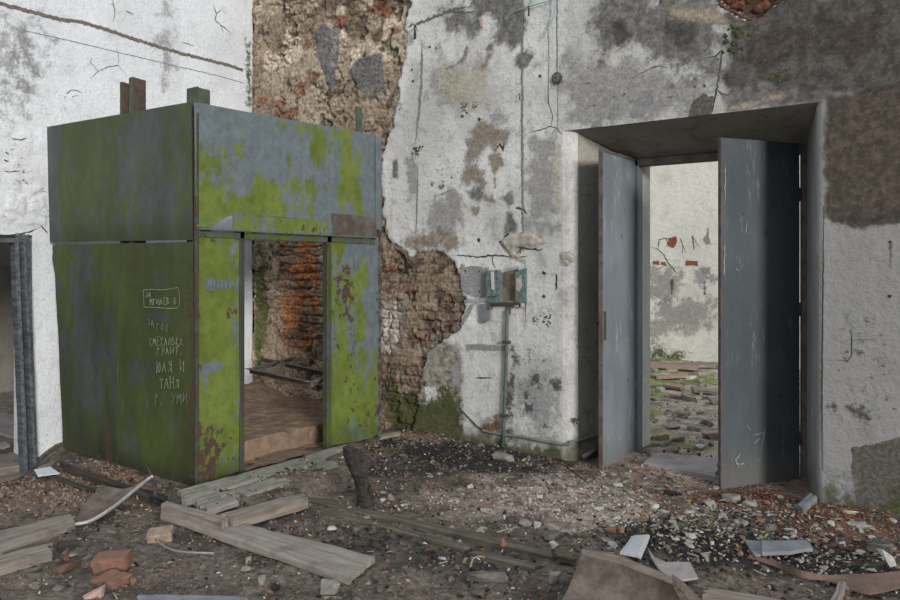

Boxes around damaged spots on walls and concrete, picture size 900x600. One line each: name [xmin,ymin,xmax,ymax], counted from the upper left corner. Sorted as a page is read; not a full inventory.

crack [22,30,243,98]
spalling [251,0,412,161]
water stain [405,0,533,251]
crack [707,50,730,108]
spalling [667,0,785,25]
water stain [558,0,900,228]
spalling [251,233,368,401]
spalling [382,197,471,439]
crack [458,246,543,267]